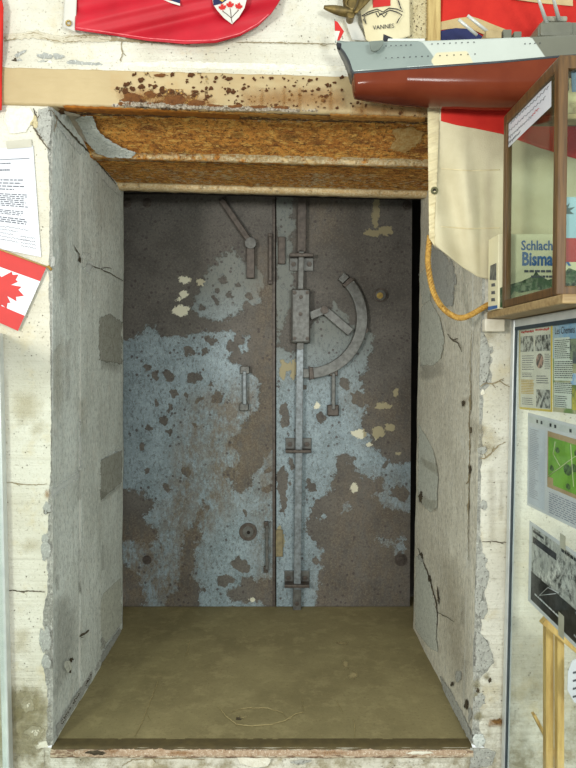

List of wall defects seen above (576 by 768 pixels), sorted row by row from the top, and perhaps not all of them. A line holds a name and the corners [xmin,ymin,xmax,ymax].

corrosion [63,72,428,153]
crack [74,246,123,281]
spalling [39,106,121,746]
peeling [73,278,496,768]
crack [417,548,454,631]